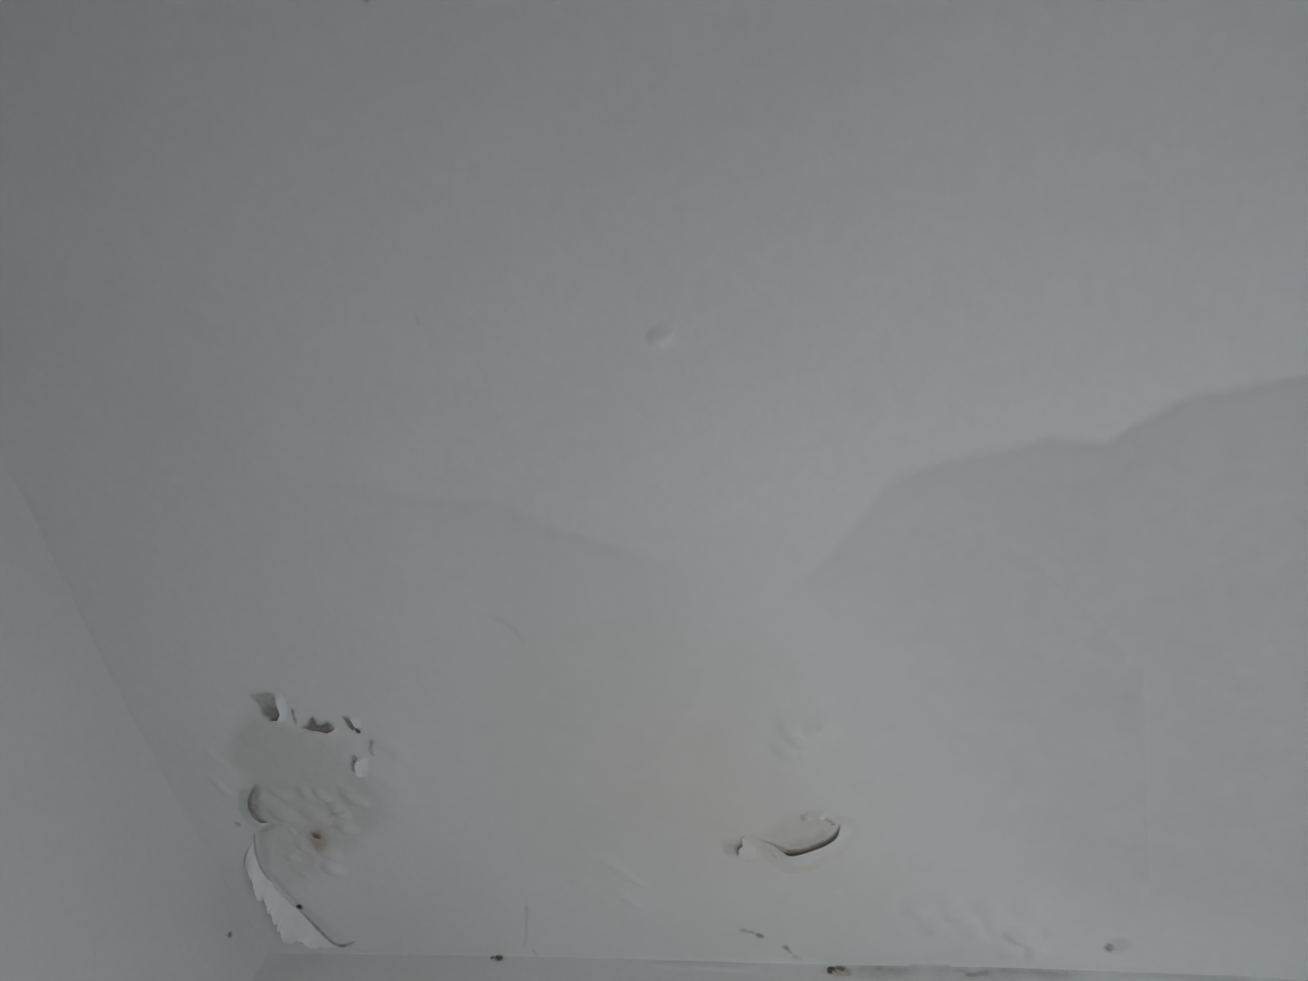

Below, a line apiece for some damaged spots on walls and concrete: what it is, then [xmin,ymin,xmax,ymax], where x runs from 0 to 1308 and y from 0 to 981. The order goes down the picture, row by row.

peeling [245,840,340,949]